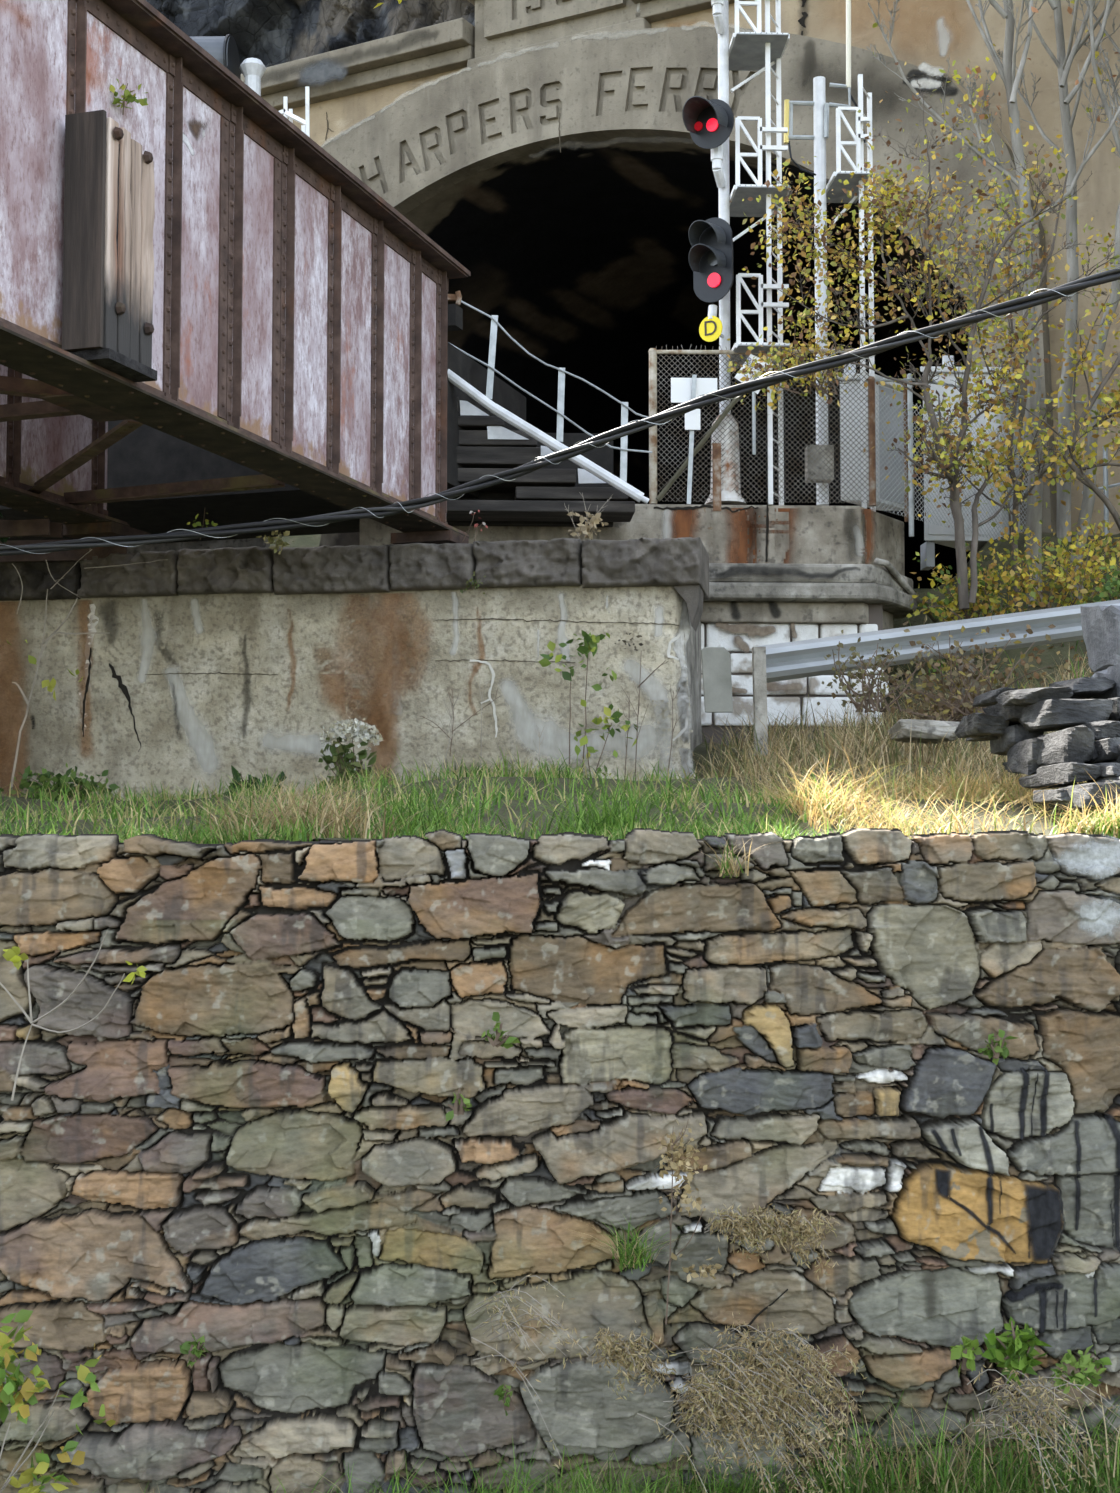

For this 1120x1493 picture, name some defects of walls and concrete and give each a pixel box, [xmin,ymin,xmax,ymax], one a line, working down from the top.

rust [672,508,794,564]
rust [862,509,873,564]
crack [435,618,681,660]
crack [79,604,278,752]
rust [319,593,427,783]